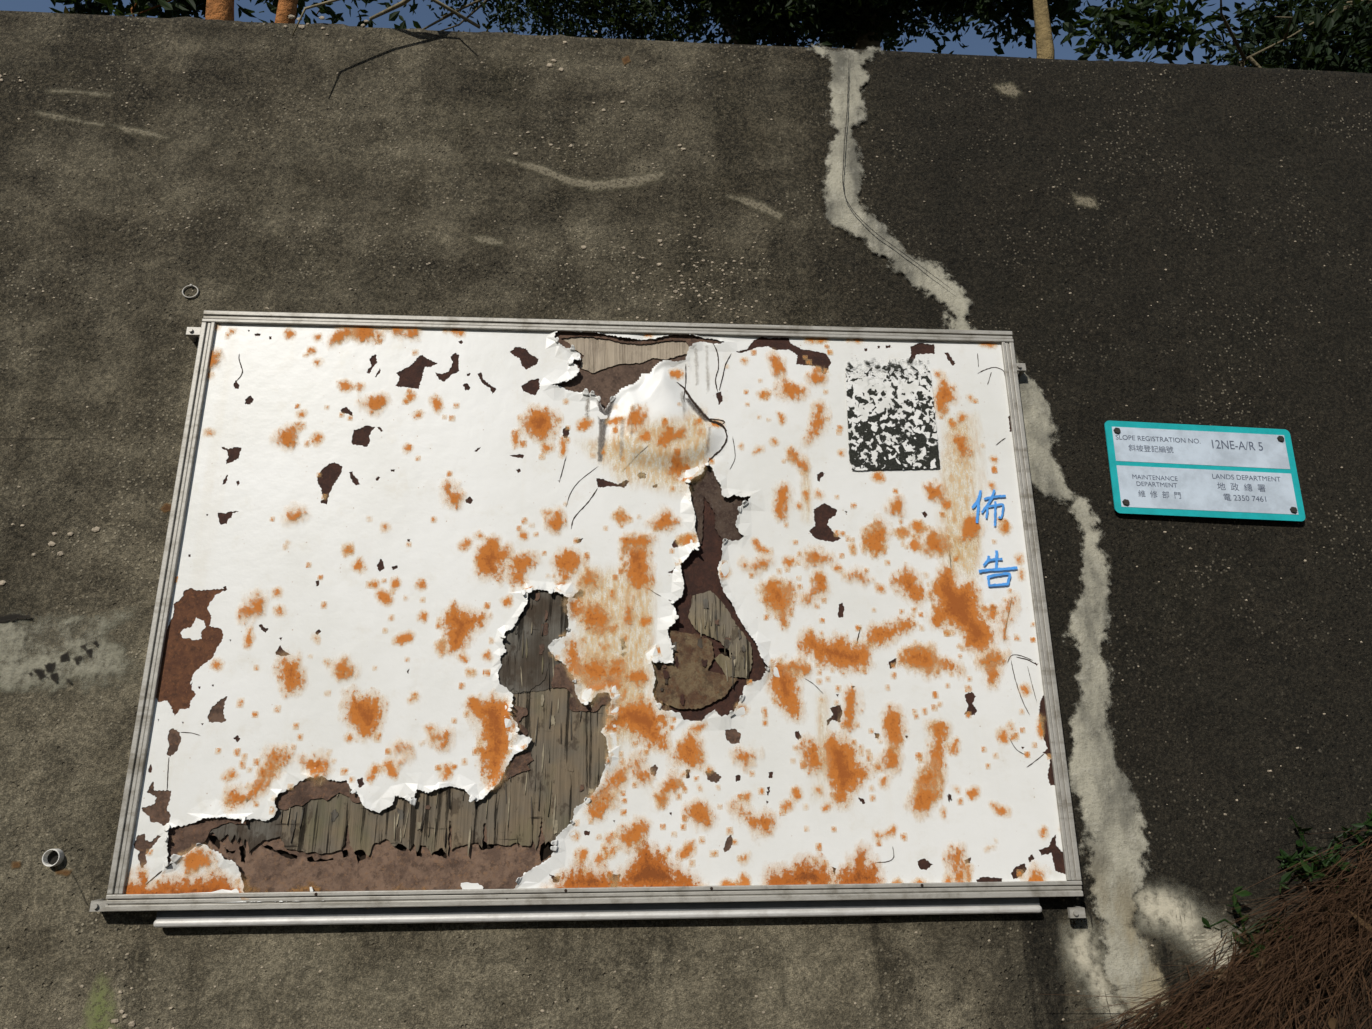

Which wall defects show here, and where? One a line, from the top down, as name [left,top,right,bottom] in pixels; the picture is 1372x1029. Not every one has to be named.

corrosion [304,327,419,365]
corrosion [554,332,723,348]
corrosion [327,380,387,419]
corrosion [404,388,458,420]
peeling [582,388,616,402]
corrosion [740,338,842,471]
corrosion [934,372,978,462]
crack [812,45,1249,1029]
peeling [259,624,291,656]
peeling [156,586,231,757]
corrosion [982,715,1051,766]
peeling [134,765,203,868]